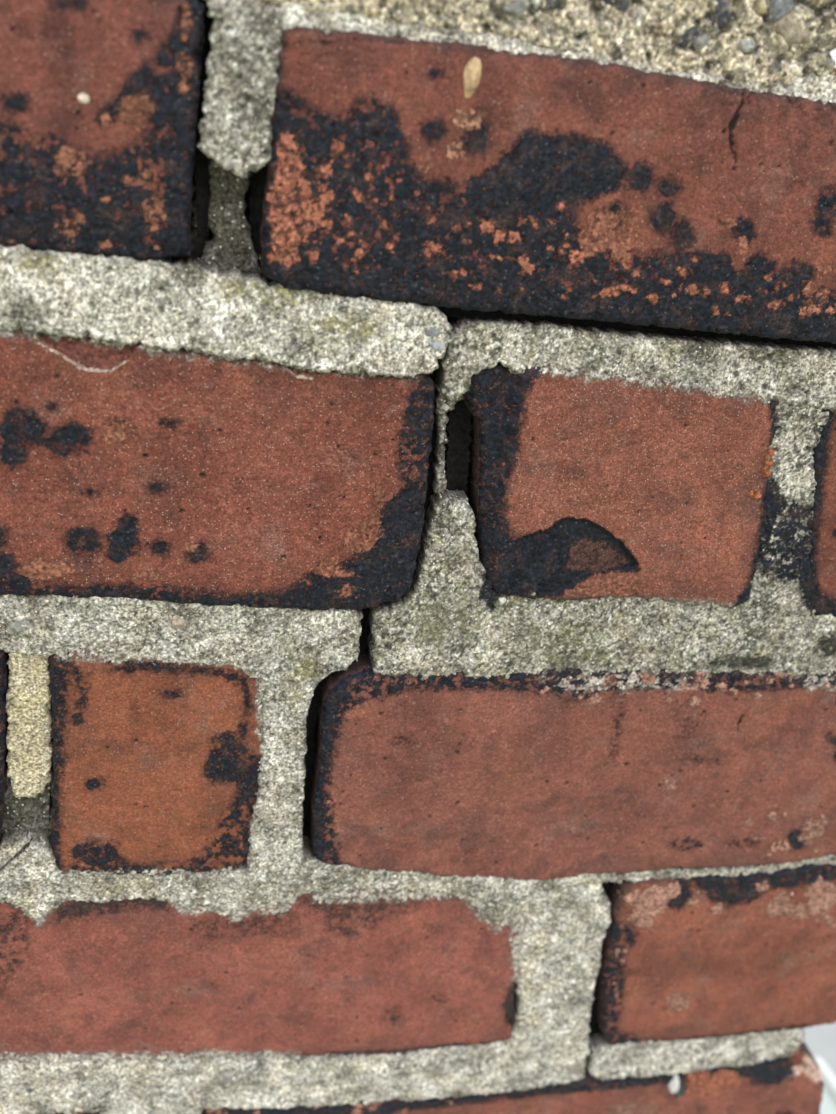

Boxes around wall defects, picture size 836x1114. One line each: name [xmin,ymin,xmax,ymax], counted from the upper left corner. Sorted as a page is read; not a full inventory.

crack [729,91,802,163]
crack [422,369,473,531]
crack [358,608,370,658]
crack [302,679,324,839]
peeling [742,814,829,857]
crack [602,881,614,897]
crack [588,977,602,1037]